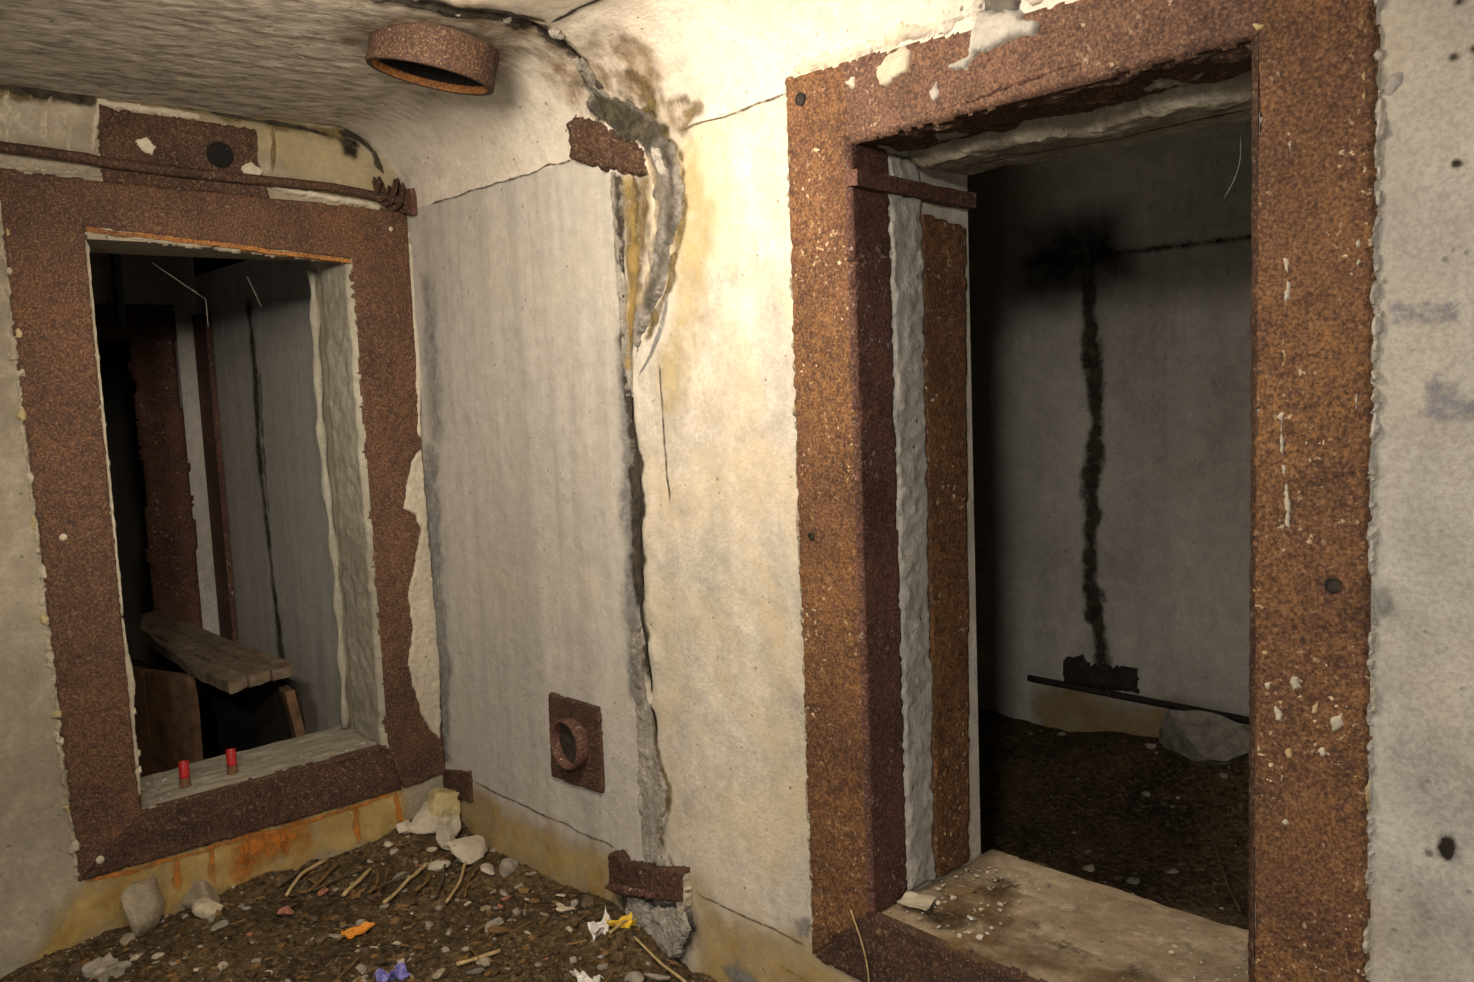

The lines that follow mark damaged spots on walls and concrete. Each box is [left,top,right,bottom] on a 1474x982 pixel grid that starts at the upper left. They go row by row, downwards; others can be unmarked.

flaking render [403,233,441,749]
crack [615,176,670,747]
water stain [590,35,702,128]
water stain [675,166,706,325]